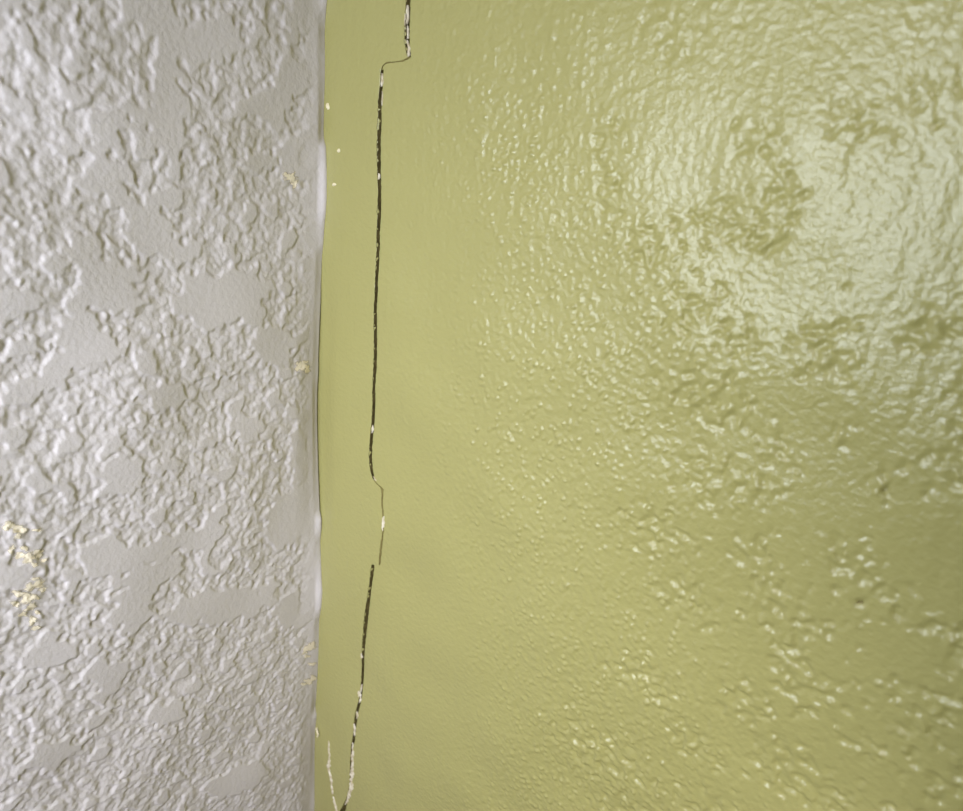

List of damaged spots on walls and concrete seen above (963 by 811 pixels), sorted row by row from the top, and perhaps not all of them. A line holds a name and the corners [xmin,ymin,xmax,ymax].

crack [326,0,411,811]